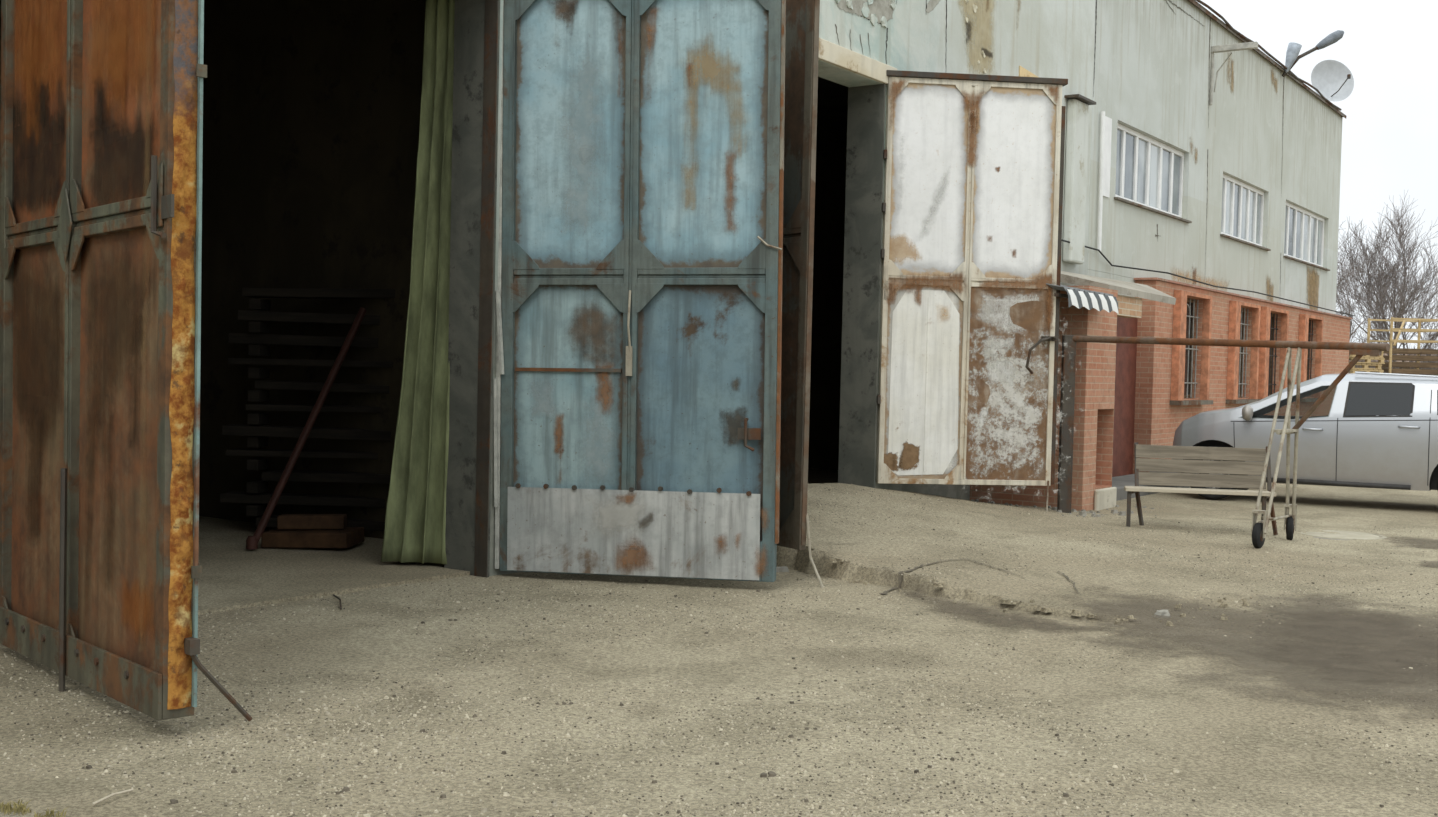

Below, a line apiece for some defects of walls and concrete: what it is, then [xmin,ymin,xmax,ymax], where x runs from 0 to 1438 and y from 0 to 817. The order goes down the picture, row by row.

flaking render [835,0,896,28]
flaking render [965,0,992,74]
corrosion [12,82,64,211]
corrosion [89,86,153,206]
corrosion [688,49,741,124]
corrosion [891,80,904,108]
corrosion [964,93,981,166]
corrosion [726,155,734,229]
corrosion [555,416,563,457]
corrosion [721,409,745,444]
corrosion [617,539,648,568]